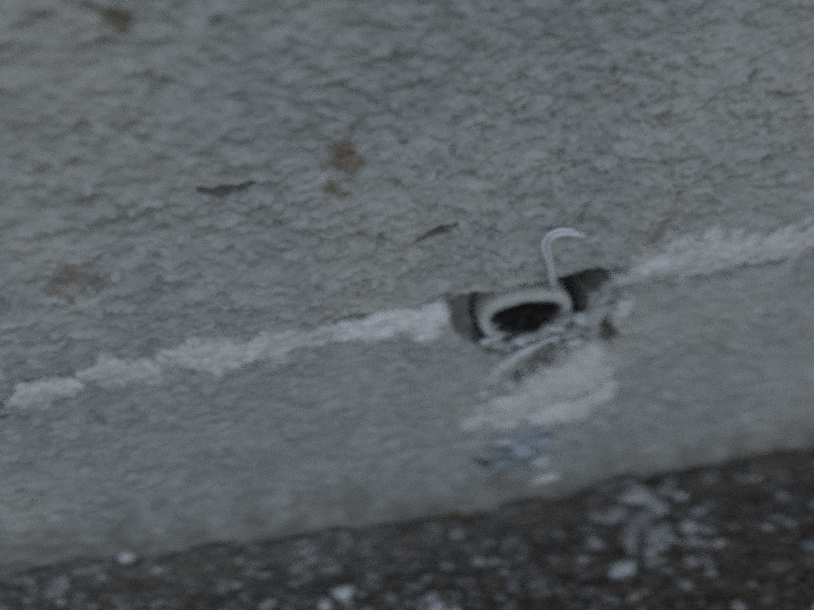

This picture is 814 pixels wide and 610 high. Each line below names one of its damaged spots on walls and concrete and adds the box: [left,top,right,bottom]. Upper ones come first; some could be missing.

crack [413,223,456,243]
crack [333,312,376,322]
spalling [443,268,624,397]
peeling [485,420,561,475]